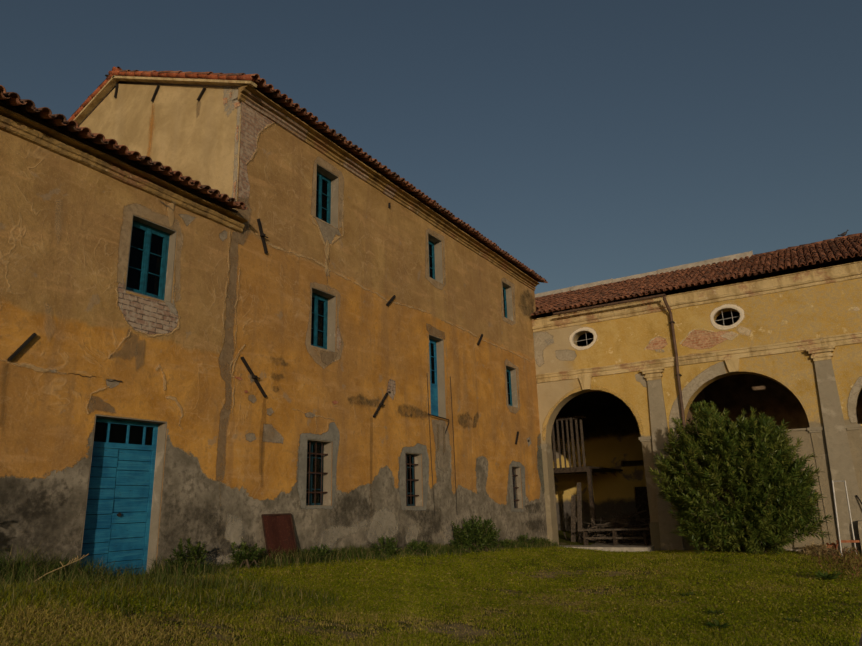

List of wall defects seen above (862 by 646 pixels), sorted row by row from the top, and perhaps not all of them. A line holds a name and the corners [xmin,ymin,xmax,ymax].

flaking render [219,86,308,244]
flaking render [116,203,195,337]
crack [8,362,115,380]
flaking render [246,408,284,444]
peeling [542,386,643,440]
flaking render [669,361,727,436]
flaking render [0,428,94,575]
flaking render [156,422,548,572]